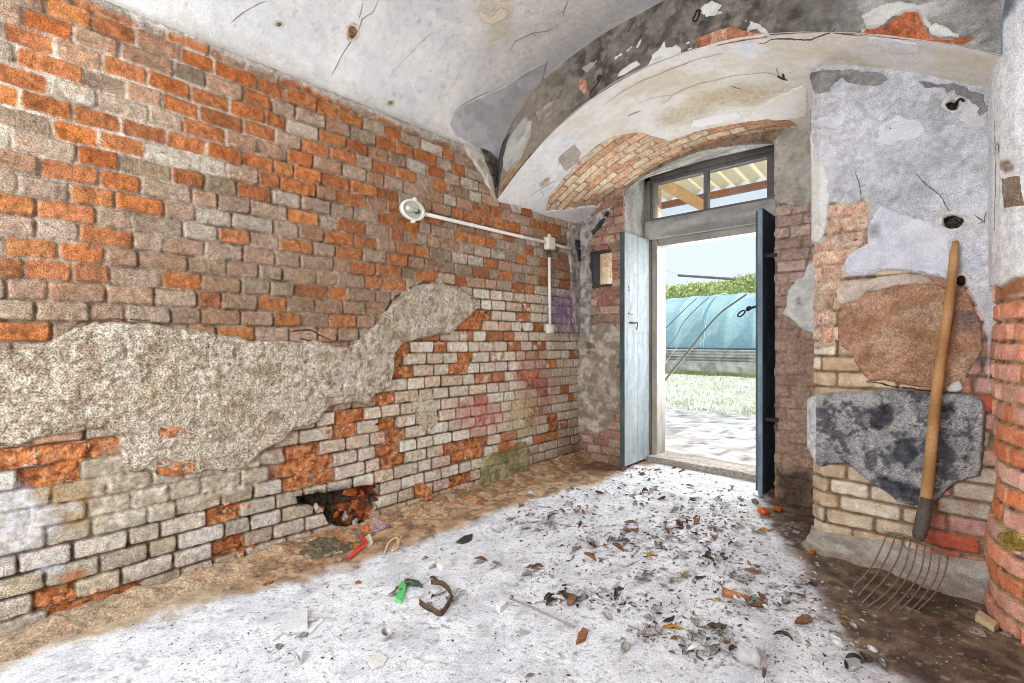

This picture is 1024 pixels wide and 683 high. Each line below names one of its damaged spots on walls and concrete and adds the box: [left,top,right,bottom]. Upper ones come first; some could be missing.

crack [331,2,378,76]
flaking render [615,20,771,76]
peeling [861,1,974,54]
peeling [500,99,562,193]
crack [915,136,1000,230]
corrosion [407,221,418,243]
flaking render [545,69,988,392]
spalling [0,437,121,493]
spalling [268,392,415,527]
spalling [443,424,491,491]
spalling [211,533,255,561]
spalling [32,580,138,615]